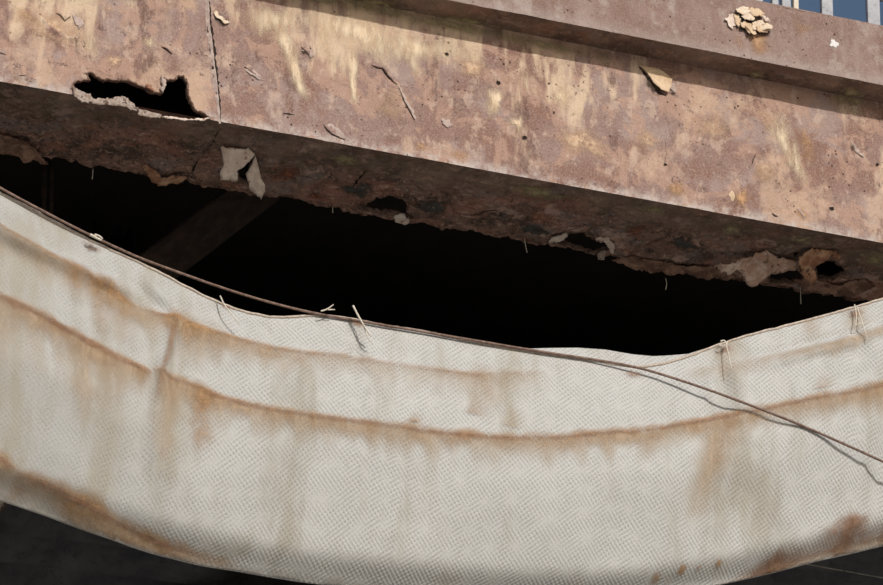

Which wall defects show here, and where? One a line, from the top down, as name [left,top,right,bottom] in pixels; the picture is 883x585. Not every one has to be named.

peeling [725,6,773,35]
peeling [71,85,210,121]
crack [178,0,222,183]
corrosion [488,91,502,112]
peeling [639,65,676,96]
peeling [0,134,49,165]
peeling [220,146,265,199]
corrosion [564,131,603,155]
corrosion [775,121,804,174]
peeling [595,236,874,297]
corrosion [12,303,147,376]
corrosion [164,313,249,360]